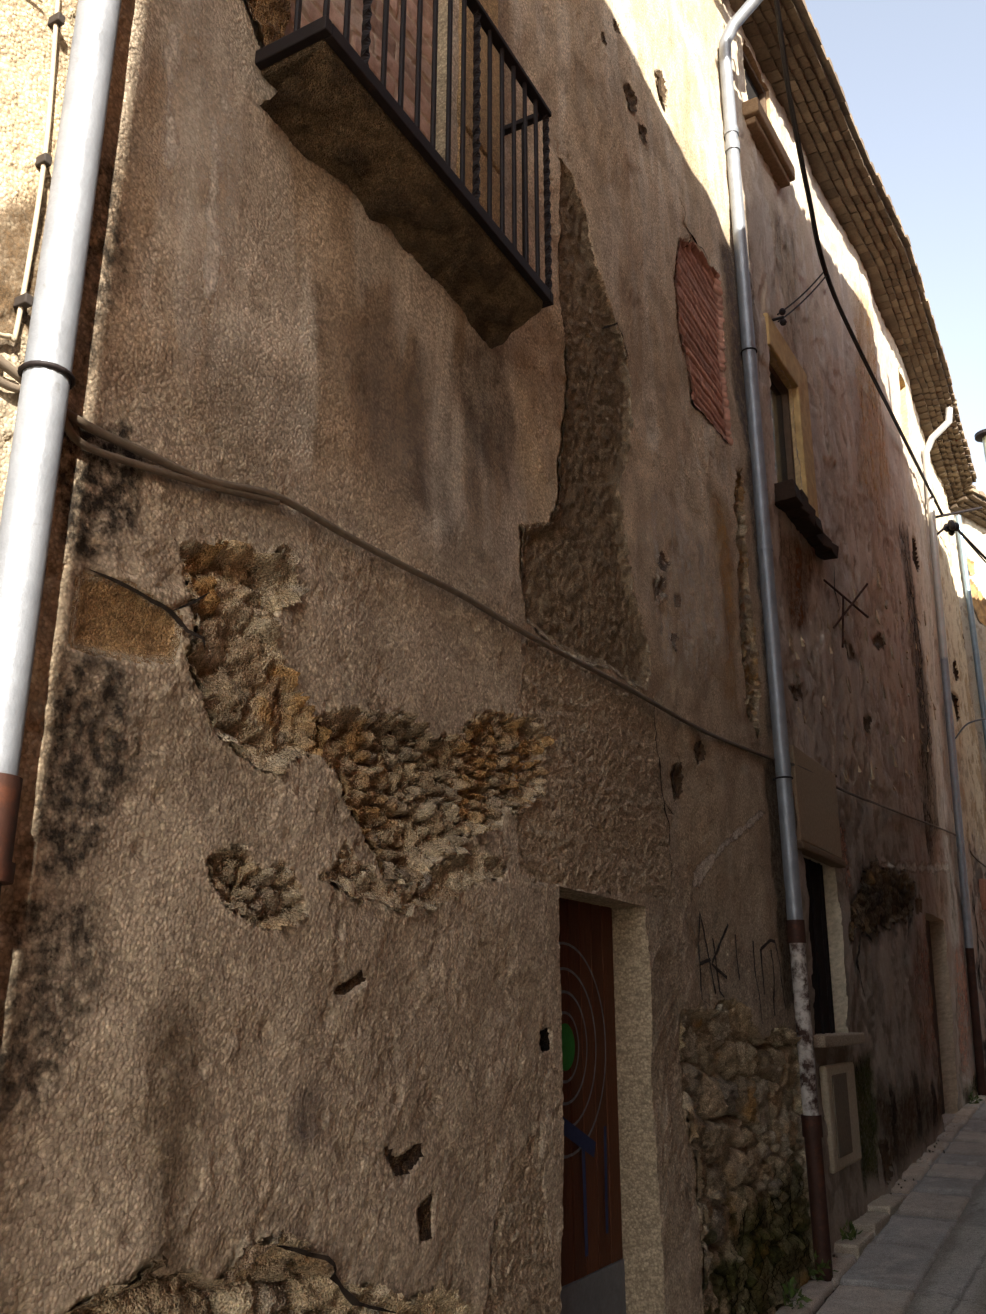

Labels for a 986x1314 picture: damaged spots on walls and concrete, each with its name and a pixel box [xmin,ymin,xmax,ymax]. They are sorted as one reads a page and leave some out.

flaking render [674,238,733,446]
peeling [520,156,651,691]
flaking render [653,551,682,608]
flaking render [68,540,556,929]
flaking render [848,857,922,941]
spalling [418,1194,432,1243]
crack [276,1245,396,1313]